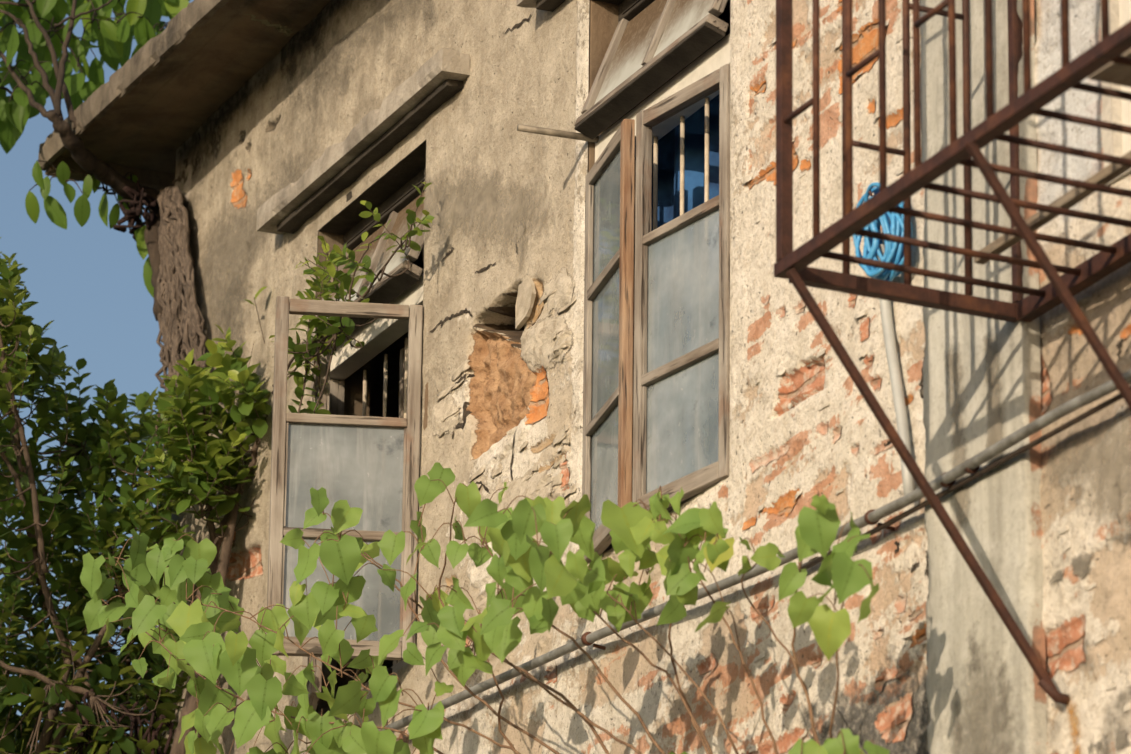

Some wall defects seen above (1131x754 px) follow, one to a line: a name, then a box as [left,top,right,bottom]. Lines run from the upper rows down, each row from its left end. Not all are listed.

crack [505,14,531,34]
spalling [833,18,889,94]
water stain [179,82,251,177]
spalling [742,161,776,189]
crack [430,308,472,332]
crack [449,373,475,439]
spalling [436,278,576,498]
spalling [774,348,893,456]
water stain [946,350,968,529]
water stain [984,335,1002,465]
spalling [1044,614,1103,679]
spalling [875,692,913,743]